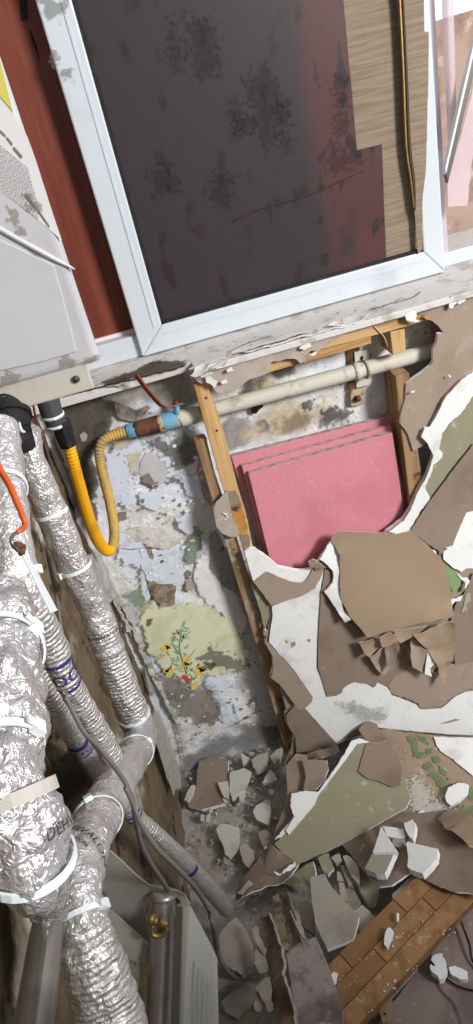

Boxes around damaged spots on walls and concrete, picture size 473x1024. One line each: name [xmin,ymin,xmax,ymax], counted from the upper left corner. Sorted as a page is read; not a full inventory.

peeling [190,313,372,387]
leakage [225,398,354,449]
peeling [105,425,266,740]
spalling [318,738,369,796]